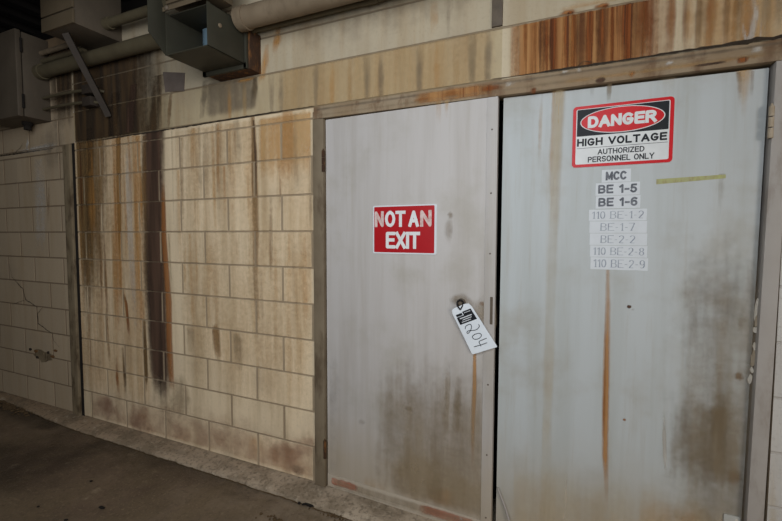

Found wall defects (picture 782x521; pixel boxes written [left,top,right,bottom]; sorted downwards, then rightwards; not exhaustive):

rust [515,1,654,75]
rust [76,139,103,285]
rust [105,135,121,294]
rust [136,131,173,393]
spalling [29,348,57,362]
crack [15,406,352,521]